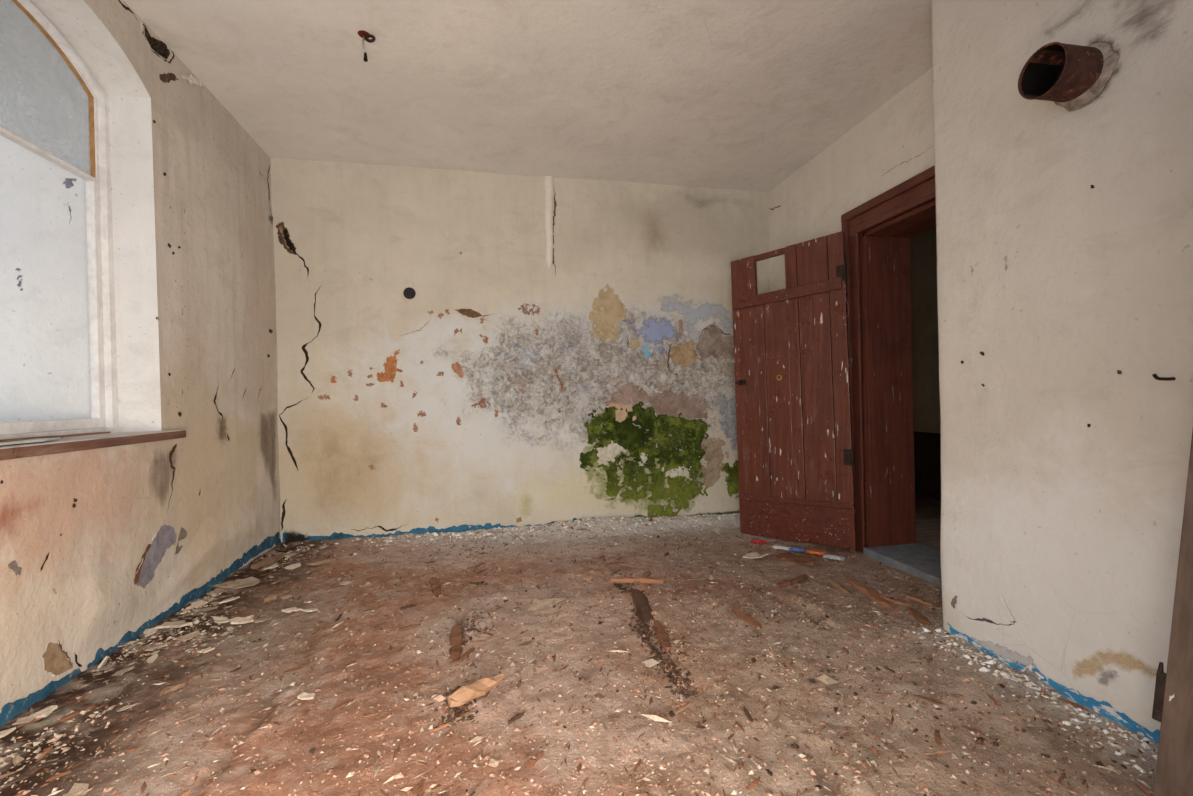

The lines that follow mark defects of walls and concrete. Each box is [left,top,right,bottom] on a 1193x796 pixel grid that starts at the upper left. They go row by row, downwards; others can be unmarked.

flaking render [428,308,491,344]
peeling [518,303,541,315]
flaking render [588,283,640,349]
crack [214,254,322,470]
flaking render [317,370,353,400]
flaking render [352,349,418,403]
flaking render [436,361,465,378]
flaking render [604,319,737,489]
crack [167,444,201,511]
crack [280,499,288,531]
peeling [134,524,187,590]
flaking render [41,640,73,677]